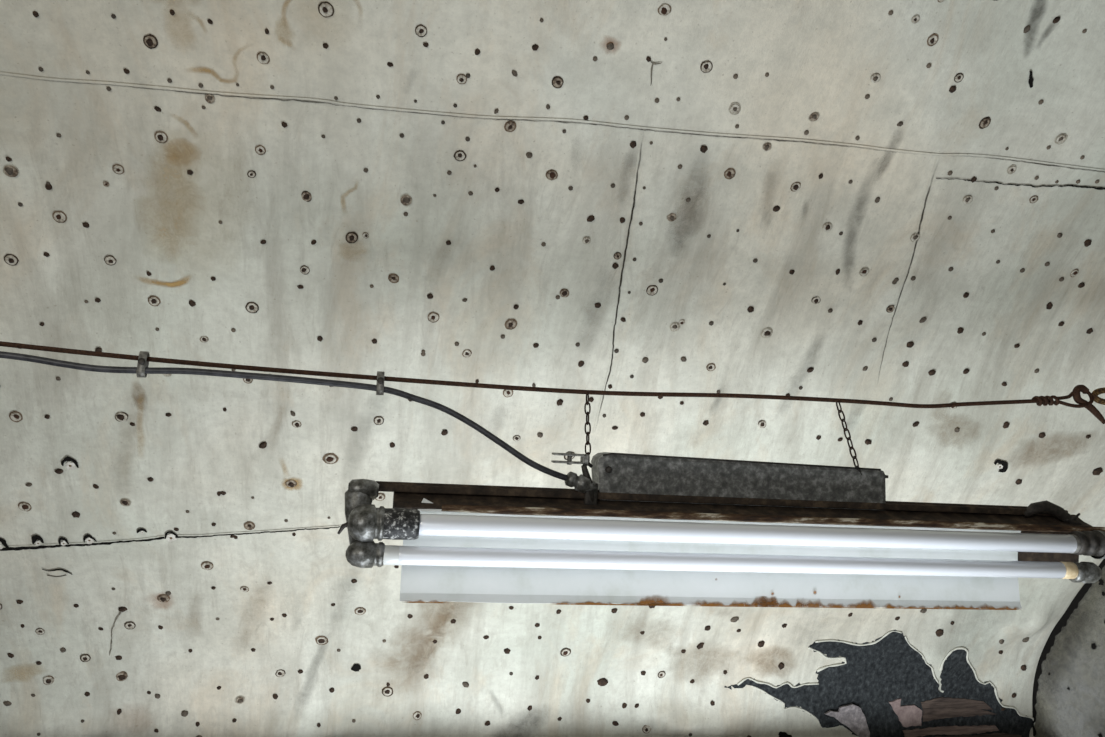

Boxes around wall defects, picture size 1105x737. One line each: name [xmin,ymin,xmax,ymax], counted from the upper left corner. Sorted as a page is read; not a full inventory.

crack [936,178,1105,190]
peeling [724,630,1035,737]